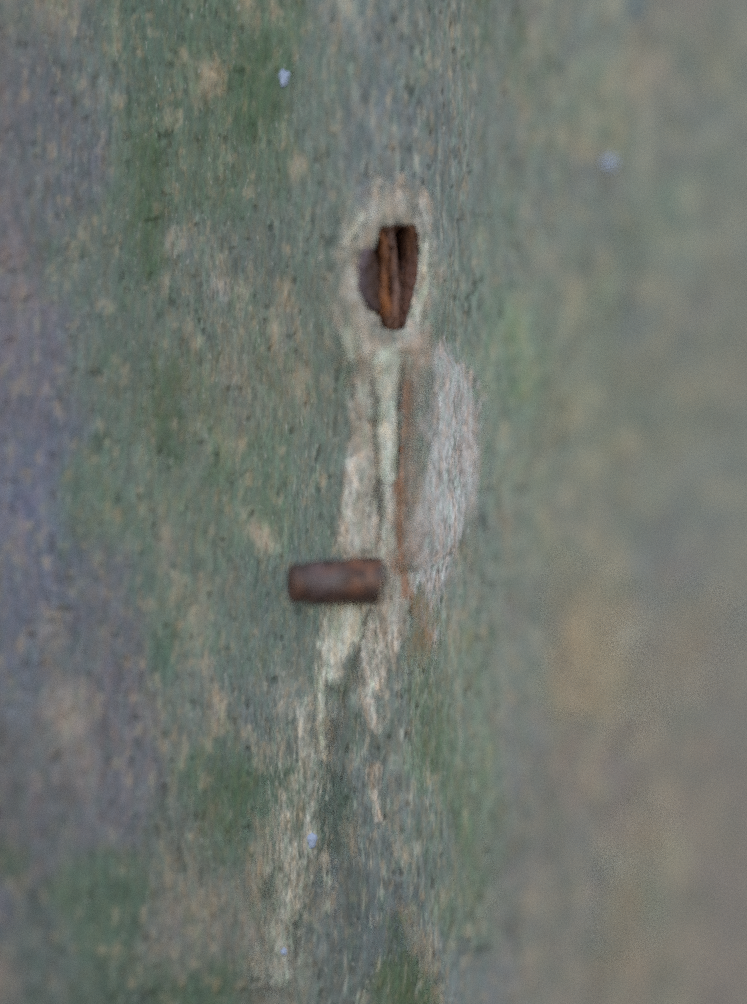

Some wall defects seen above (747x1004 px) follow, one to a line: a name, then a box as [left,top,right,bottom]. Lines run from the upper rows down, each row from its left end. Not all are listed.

peeling [264,173,481,983]